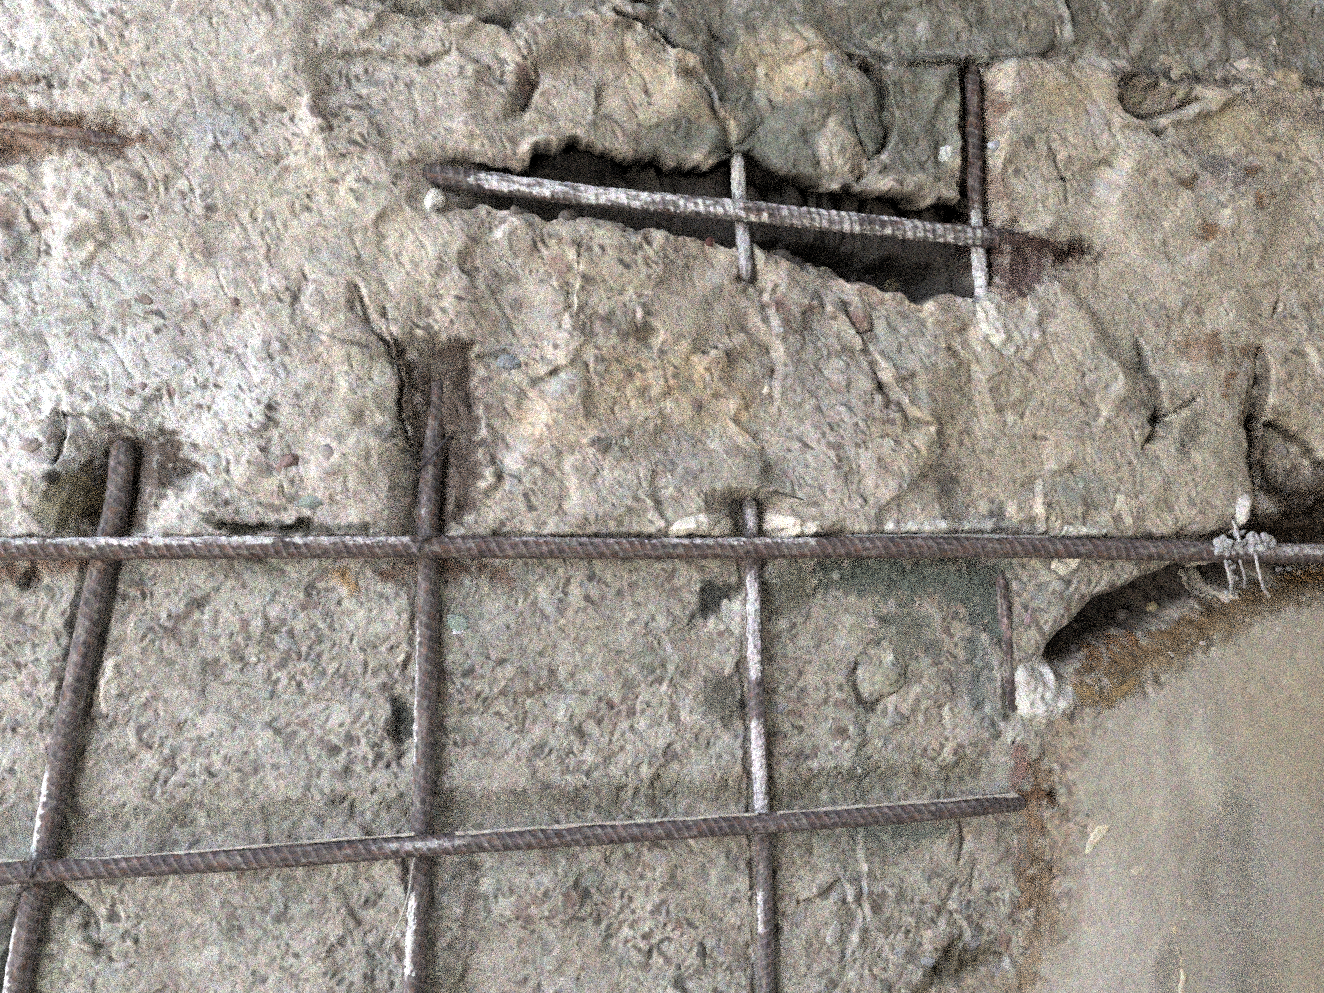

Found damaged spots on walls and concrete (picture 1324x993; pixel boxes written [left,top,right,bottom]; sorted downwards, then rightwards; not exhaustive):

rust [0,73,162,164]
spalling [0,0,1324,541]
rust [54,422,197,531]
rust [1206,415,1324,543]
rust [0,560,89,581]
rust [334,568,358,594]
rust [377,568,417,582]
rust [1073,567,1324,706]
spalling [0,533,1324,993]
rust [1011,746,1058,909]